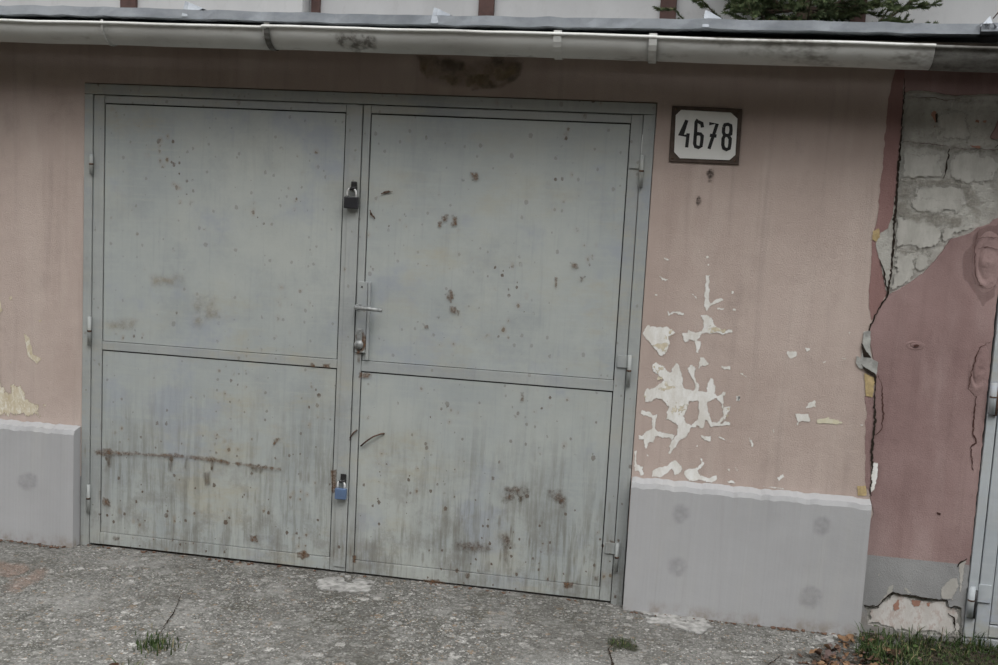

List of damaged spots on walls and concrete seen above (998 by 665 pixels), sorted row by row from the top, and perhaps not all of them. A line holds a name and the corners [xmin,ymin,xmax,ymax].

crack [869,87,998,331]
spalling [872,90,998,294]
peeling [0,384,46,417]
rust [97,449,281,484]
peeling [634,256,740,483]
peeling [795,400,842,425]
crack [870,375,885,496]
spalling [864,561,966,635]